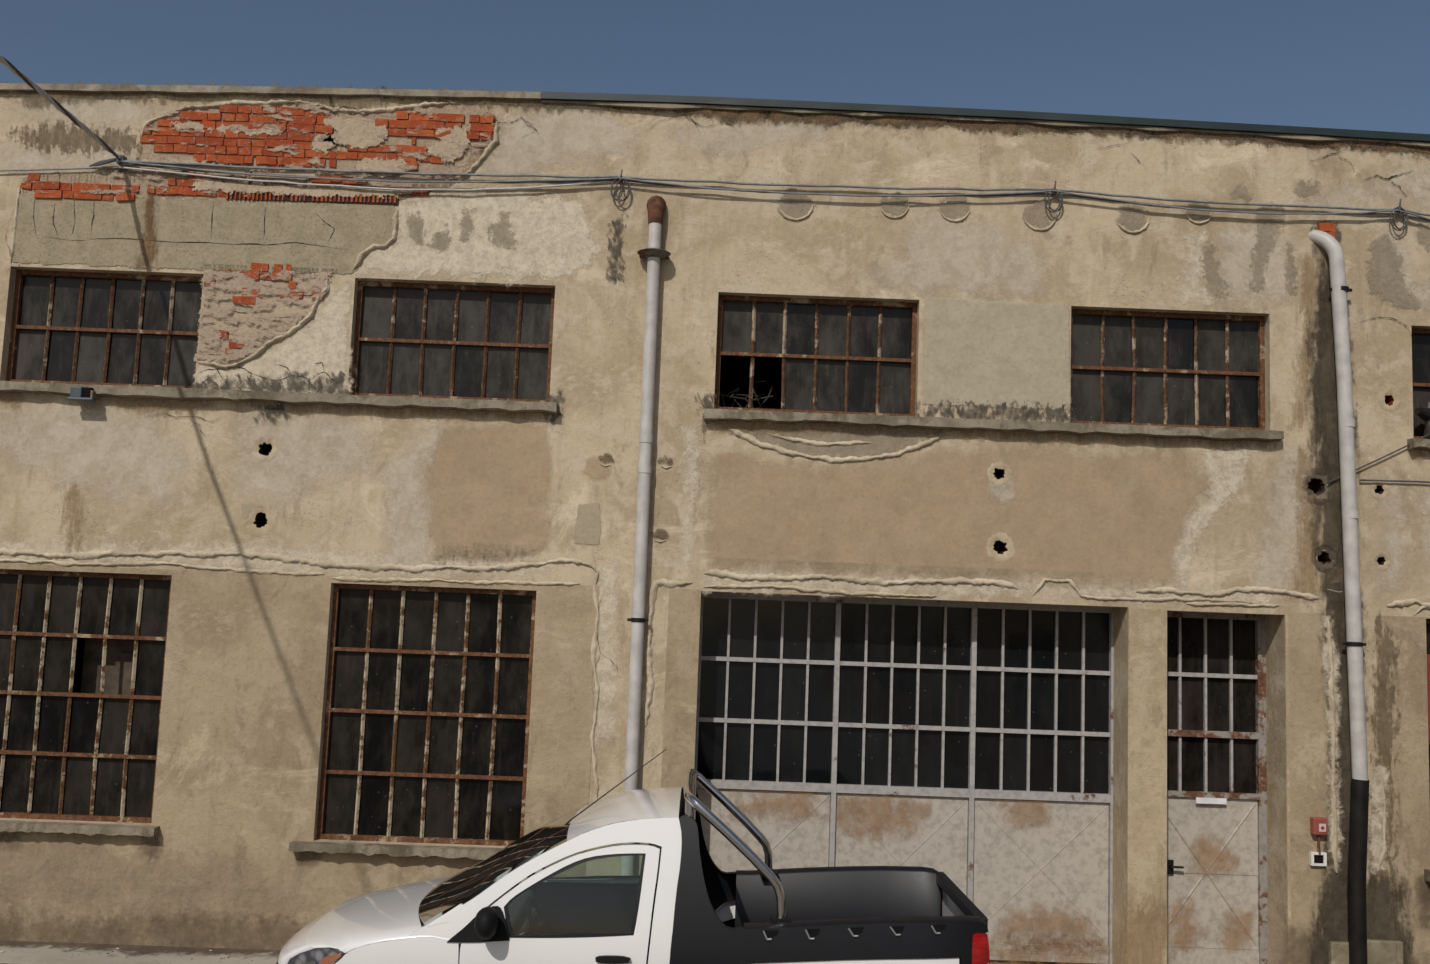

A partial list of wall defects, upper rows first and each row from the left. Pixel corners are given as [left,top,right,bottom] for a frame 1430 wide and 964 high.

spalling [0,95,1430,394]
spalling [1378,388,1401,412]
water stain [1284,245,1430,964]